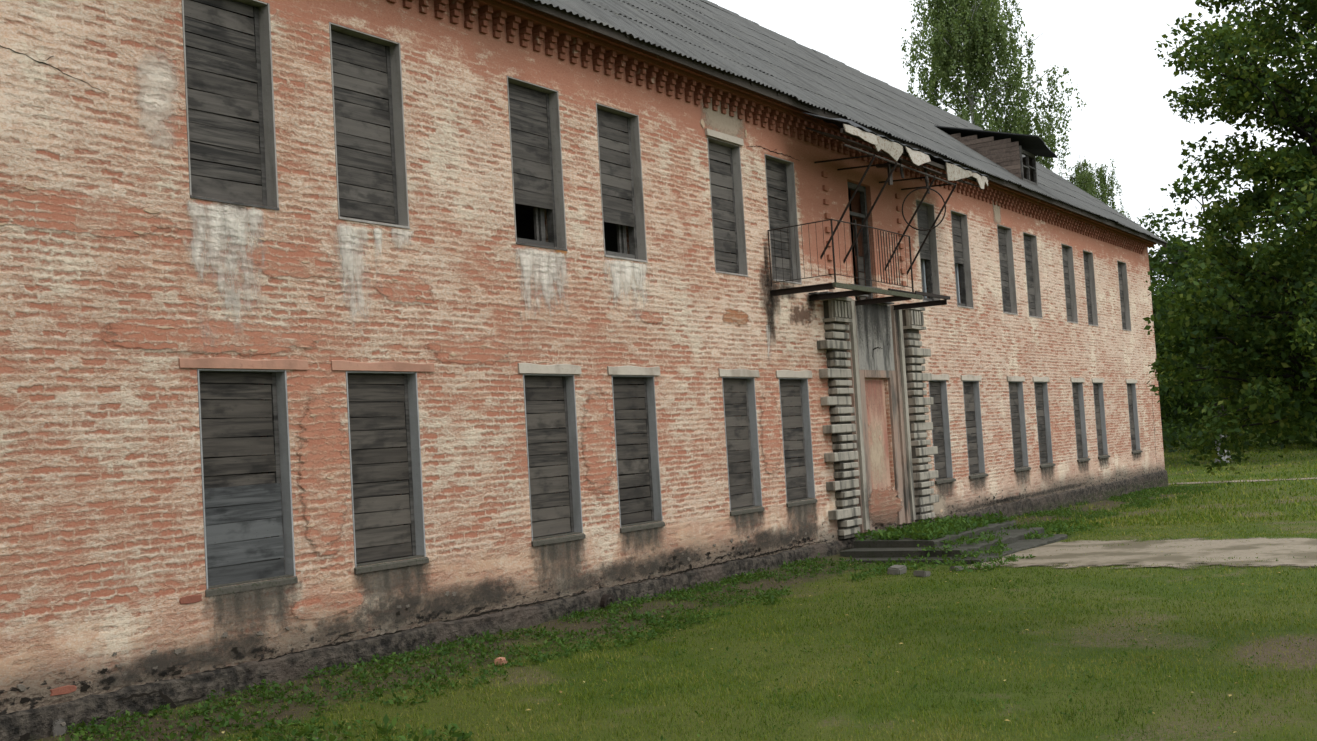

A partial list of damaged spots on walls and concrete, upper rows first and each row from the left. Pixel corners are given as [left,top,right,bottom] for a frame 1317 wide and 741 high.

crack [0,46,106,93]
damp [189,203,262,311]
damp [339,224,412,311]
damp [518,248,566,305]
damp [611,261,647,294]
damp [534,539,592,588]
damp [608,527,695,578]
damp [734,503,817,551]
damp [356,564,502,622]
damp [112,583,295,683]